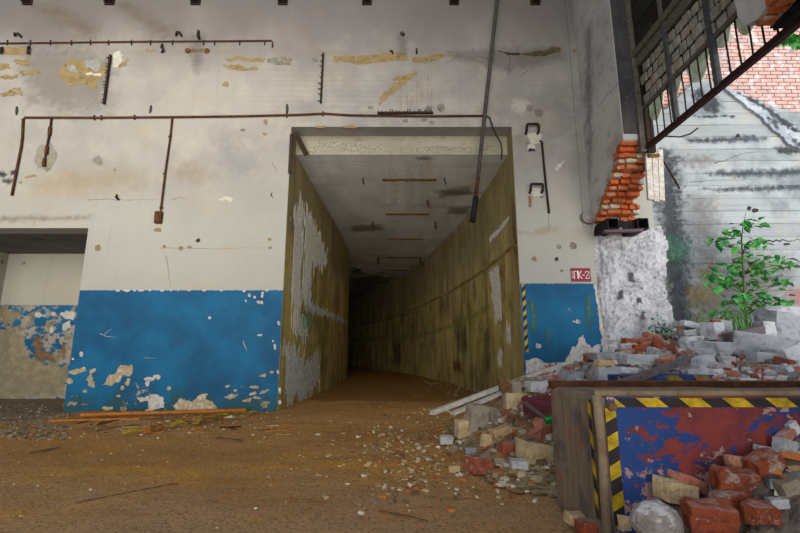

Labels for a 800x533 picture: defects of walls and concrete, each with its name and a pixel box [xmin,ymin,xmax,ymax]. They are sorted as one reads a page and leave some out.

peeling [0,46,40,97]
spalling [57,51,129,104]
peeling [222,56,292,71]
peeling [312,52,445,103]
damp [689,135,766,143]
damp [738,92,800,154]
damp [710,168,800,192]
spalling [566,141,677,361]
peeling [225,191,347,407]
peeling [0,304,133,399]
peeling [526,358,550,375]
peeling [137,374,217,411]